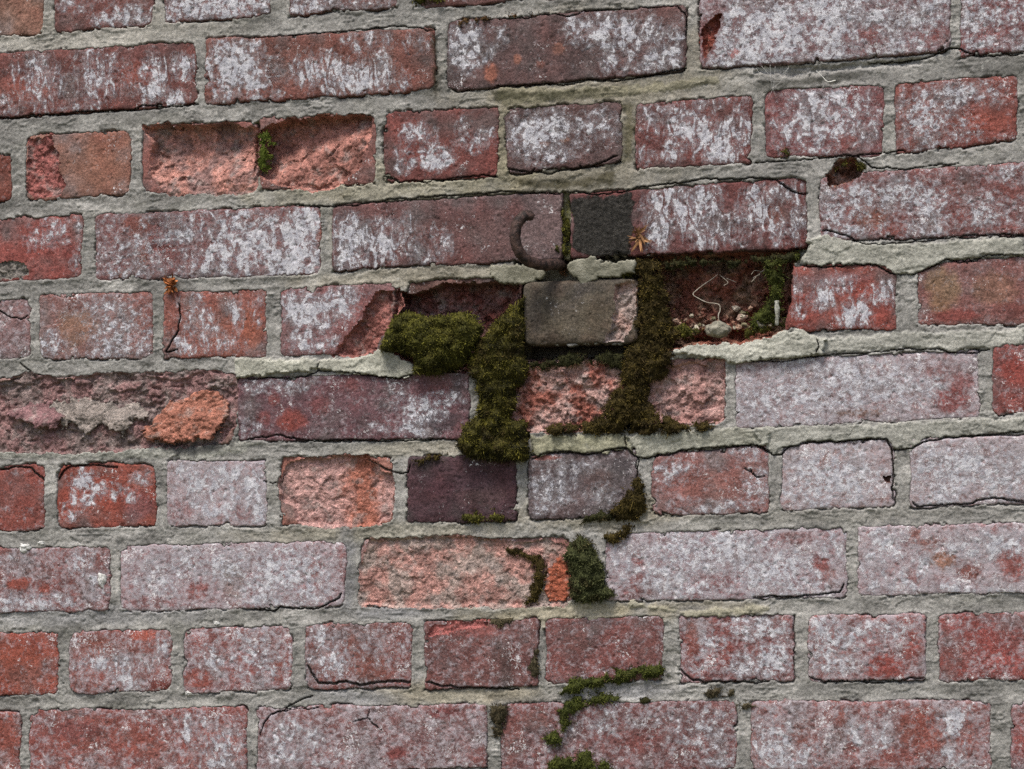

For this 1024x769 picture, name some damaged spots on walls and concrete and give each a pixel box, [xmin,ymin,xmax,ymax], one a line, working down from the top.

water stain [12,31,408,113]
water stain [565,12,685,72]
spalling [699,13,722,58]
water stain [710,0,949,67]
water stain [507,109,613,165]
water stain [638,98,751,164]
water stain [770,89,882,156]
spalling [825,157,866,187]
crack [165,303,181,352]
spalling [330,280,524,358]
spalling [602,251,800,351]
spalling [0,369,238,455]